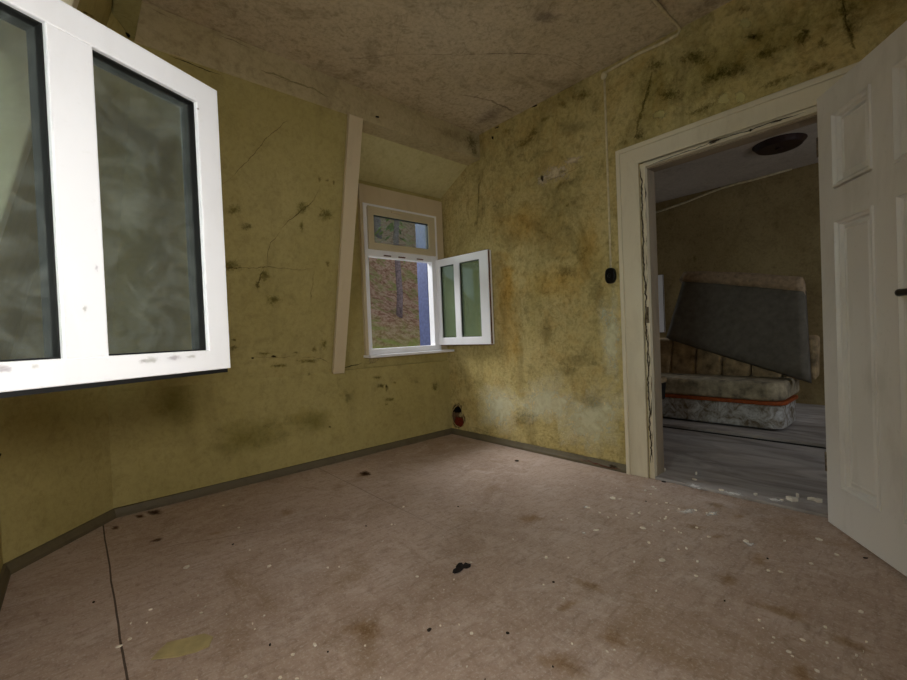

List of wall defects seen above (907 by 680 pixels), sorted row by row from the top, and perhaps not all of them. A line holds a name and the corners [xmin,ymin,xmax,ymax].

spalling [451,403,465,428]